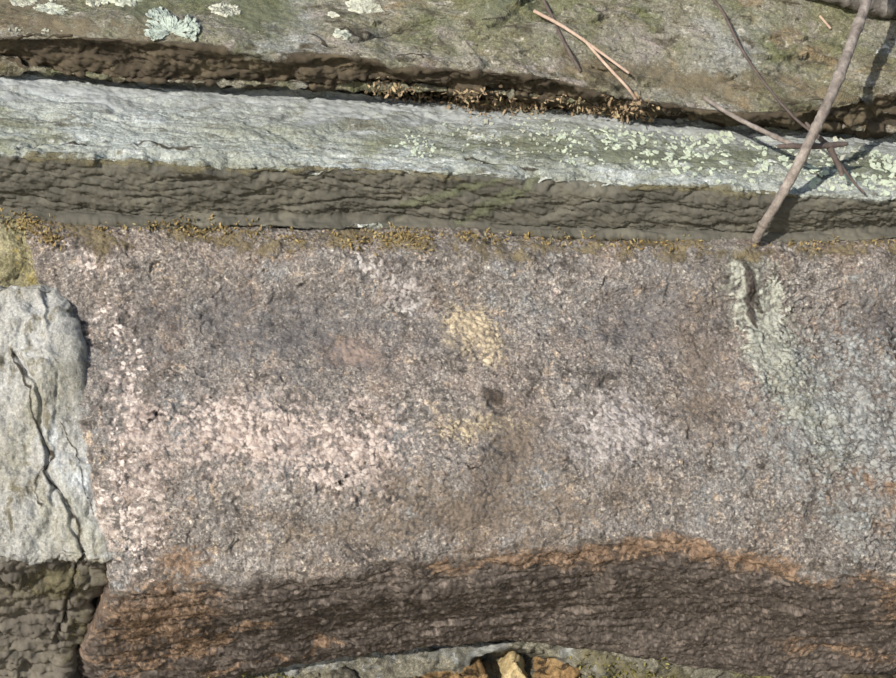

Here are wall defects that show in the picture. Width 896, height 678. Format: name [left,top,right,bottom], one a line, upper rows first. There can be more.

crack [10,348,94,642]